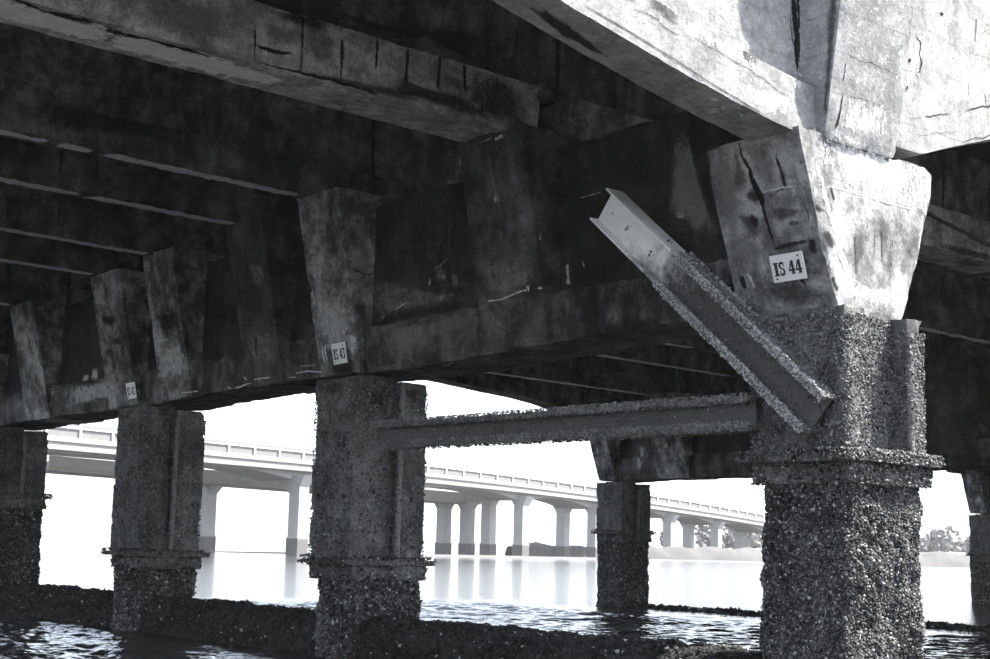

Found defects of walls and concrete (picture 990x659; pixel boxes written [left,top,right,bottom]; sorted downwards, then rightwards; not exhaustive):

crack [14,0,224,61]
crack [258,45,377,95]
crack [587,6,788,114]
water stain [733,84,799,115]
crack [790,0,800,70]
crack [913,83,990,143]
crack [739,143,775,244]